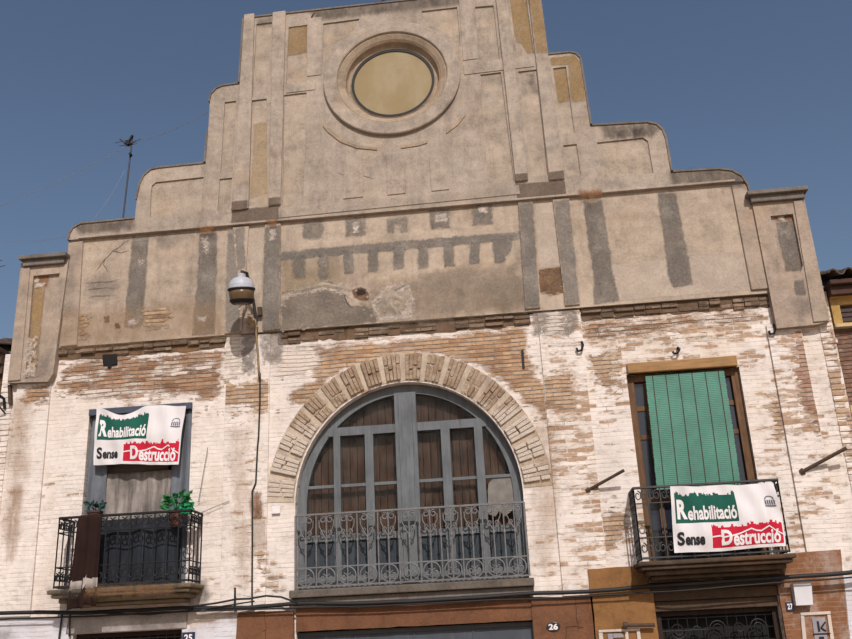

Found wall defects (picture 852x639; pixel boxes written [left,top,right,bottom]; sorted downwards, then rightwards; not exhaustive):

flaking render [334,282,415,322]
peeling [19,306,580,466]
peeling [786,330,821,442]
peeling [756,392,784,443]
peeling [602,506,628,553]
peeling [249,551,286,592]